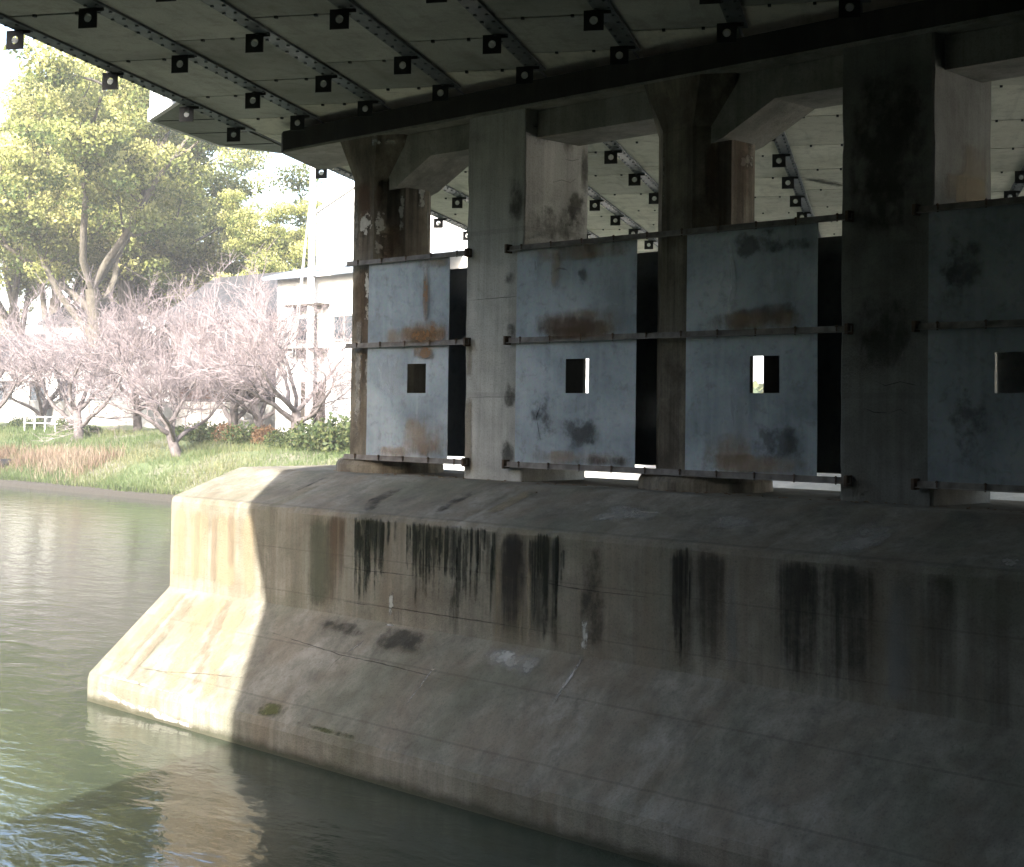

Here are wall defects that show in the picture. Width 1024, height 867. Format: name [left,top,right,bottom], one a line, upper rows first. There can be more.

peeling [360,211,386,254]
corrosion [406,276,443,358]
water stain [381,595,421,651]
water stain [354,519,564,634]
water stain [672,549,723,649]
water stain [779,563,873,670]